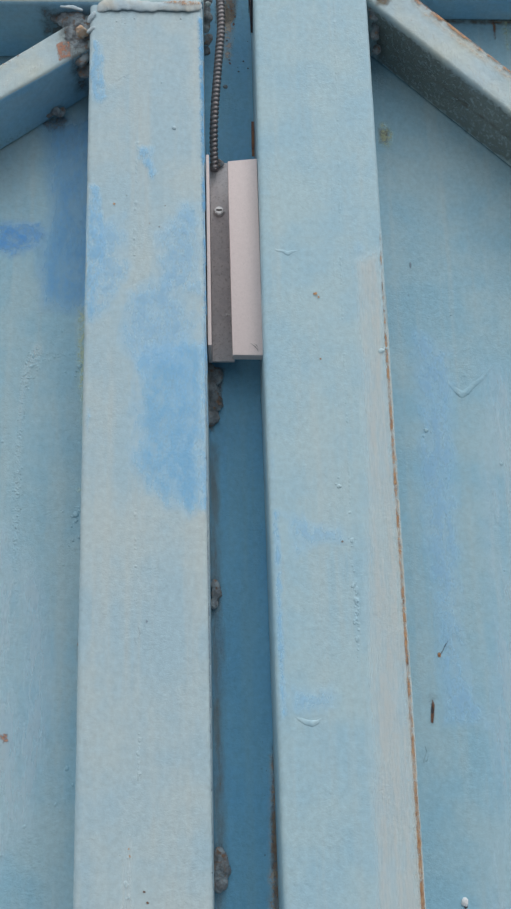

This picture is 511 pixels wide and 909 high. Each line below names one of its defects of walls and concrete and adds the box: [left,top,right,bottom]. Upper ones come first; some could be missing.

peeling [60,5,96,34]
corrosion [389,395,397,496]
corrosion [398,538,408,664]
corrosion [271,780,279,909]
corrosion [410,708,425,909]